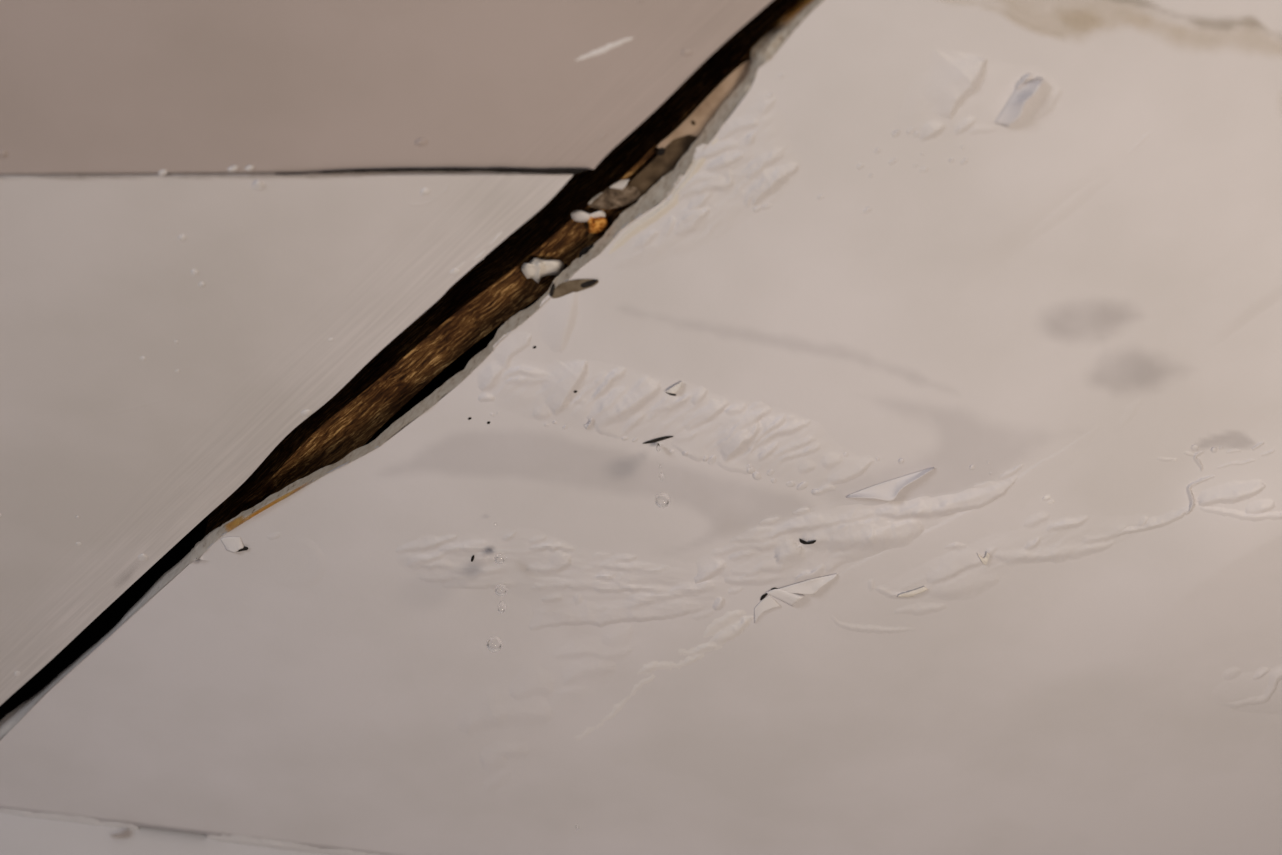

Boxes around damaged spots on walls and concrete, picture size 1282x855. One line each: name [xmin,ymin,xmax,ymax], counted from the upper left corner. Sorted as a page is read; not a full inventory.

crack [275,167,592,175]
peeling [694,463,1024,611]